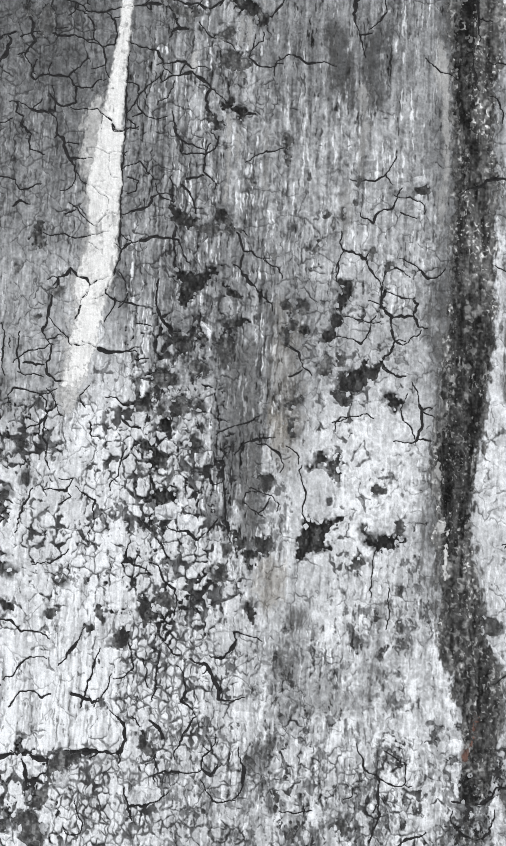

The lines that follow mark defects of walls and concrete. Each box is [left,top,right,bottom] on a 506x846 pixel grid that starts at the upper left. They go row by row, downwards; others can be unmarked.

crack [0,0,337,541]
spalling [172,265,243,307]
spalling [316,352,387,407]
crack [332,231,446,444]
damp [420,0,506,801]
crack [125,405,307,615]
spalling [209,531,273,586]
peeling [296,451,344,563]
spalling [360,520,408,553]
peeling [0,588,176,846]
crack [0,618,262,821]
crack [356,744,412,843]